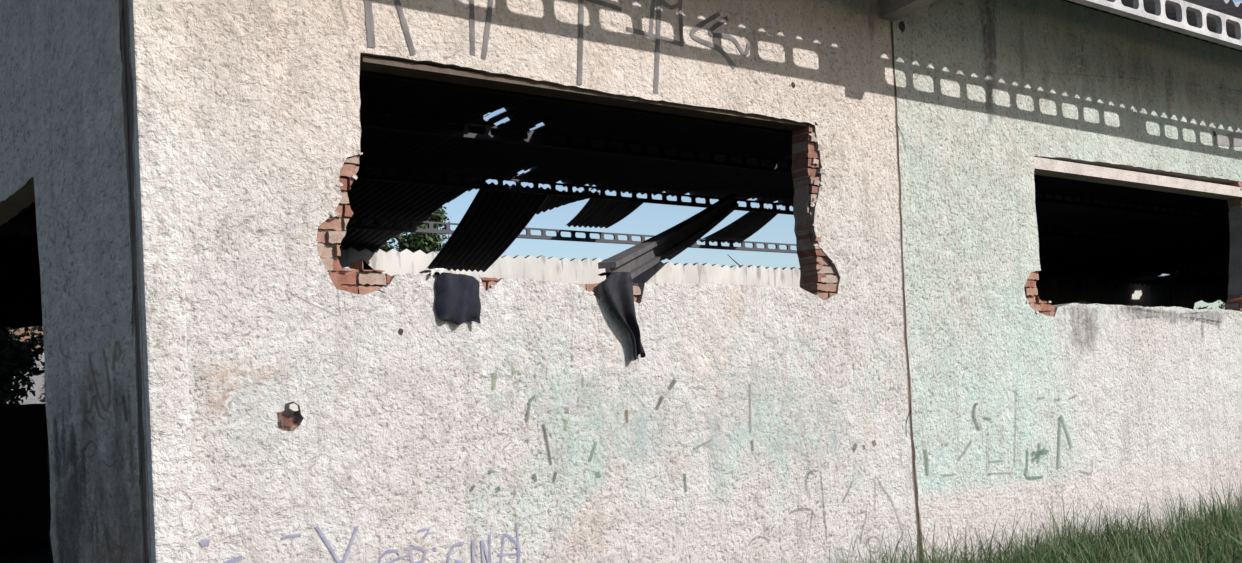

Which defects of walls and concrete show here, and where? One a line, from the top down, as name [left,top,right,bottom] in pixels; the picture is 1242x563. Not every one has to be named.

flaking render [1222,181,1242,211]
flaking render [314,153,392,295]
flaking render [791,126,838,300]
flaking render [479,275,500,290]
flaking render [579,281,603,298]
flaking render [633,284,643,305]
flaking render [1024,271,1055,316]
flaking render [1224,294,1242,312]
spalling [277,403,299,431]